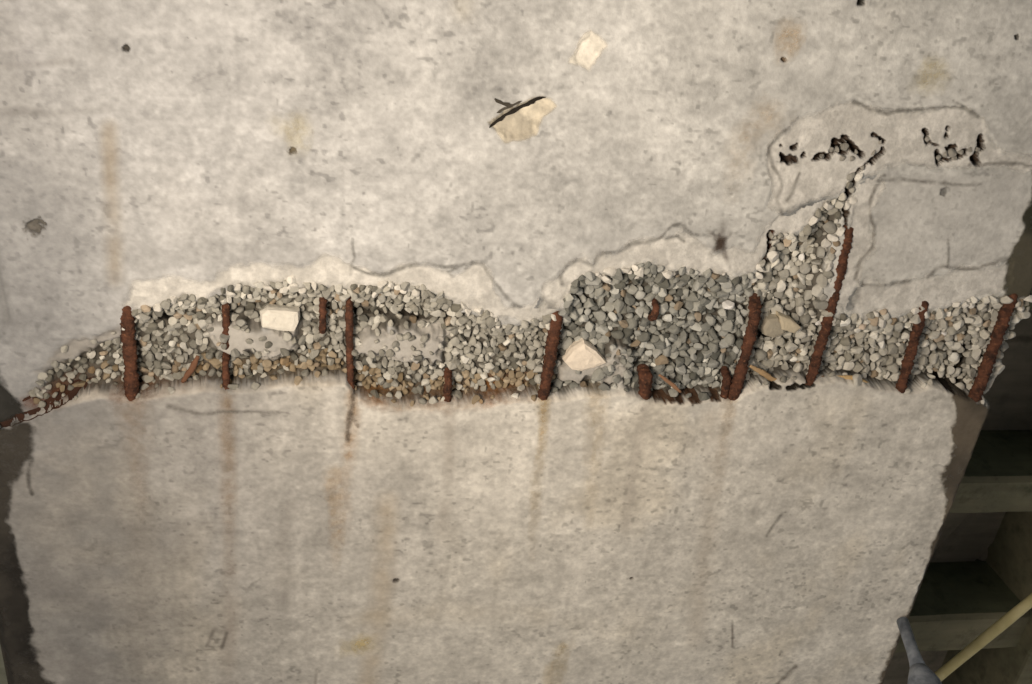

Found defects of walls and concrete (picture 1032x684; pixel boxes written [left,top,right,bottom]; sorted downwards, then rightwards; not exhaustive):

spalling [569,31,607,70]
spalling [26,97,1032,408]